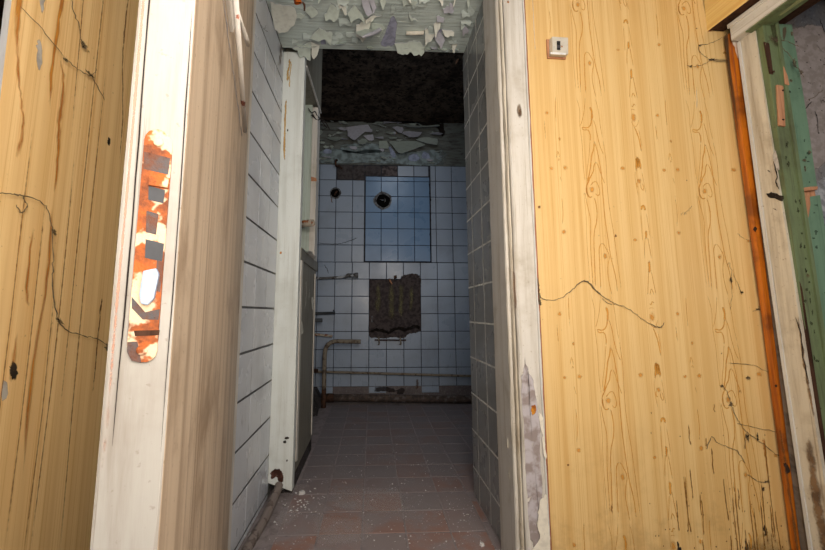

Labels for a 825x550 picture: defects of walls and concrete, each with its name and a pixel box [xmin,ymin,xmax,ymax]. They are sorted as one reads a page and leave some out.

peeling [270,0,475,61]
peeling [319,121,443,203]
crack [0,163,29,405]
crack [12,0,104,519]
peeling [521,364,550,550]